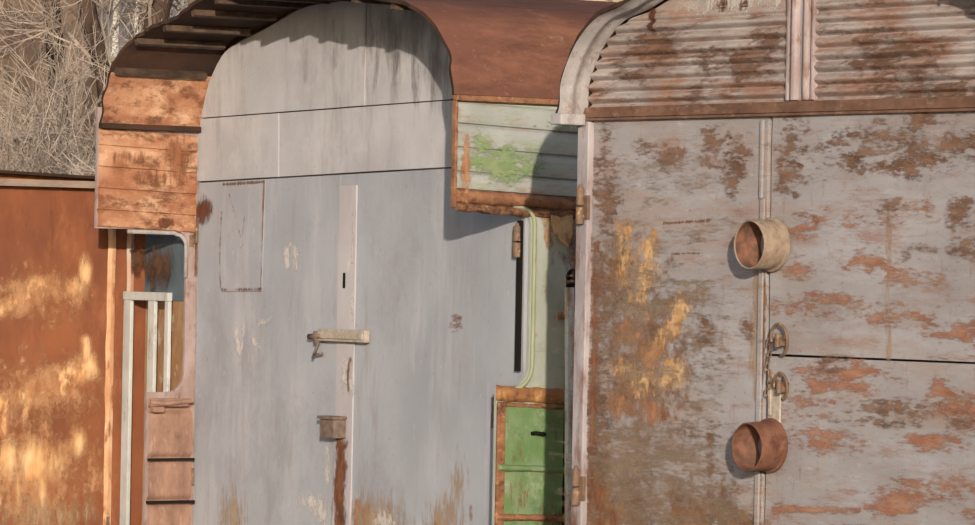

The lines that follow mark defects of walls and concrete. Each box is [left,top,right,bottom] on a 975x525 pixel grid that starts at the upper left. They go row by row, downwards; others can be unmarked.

corrosion [611,8,680,85]
corrosion [699,31,784,82]
corrosion [788,212,827,239]
corrosion [842,196,975,287]
corrosion [570,122,785,525]
corrosion [769,262,975,359]
corrosion [781,356,975,455]
corrosion [334,438,399,525]
corrosion [863,476,975,516]